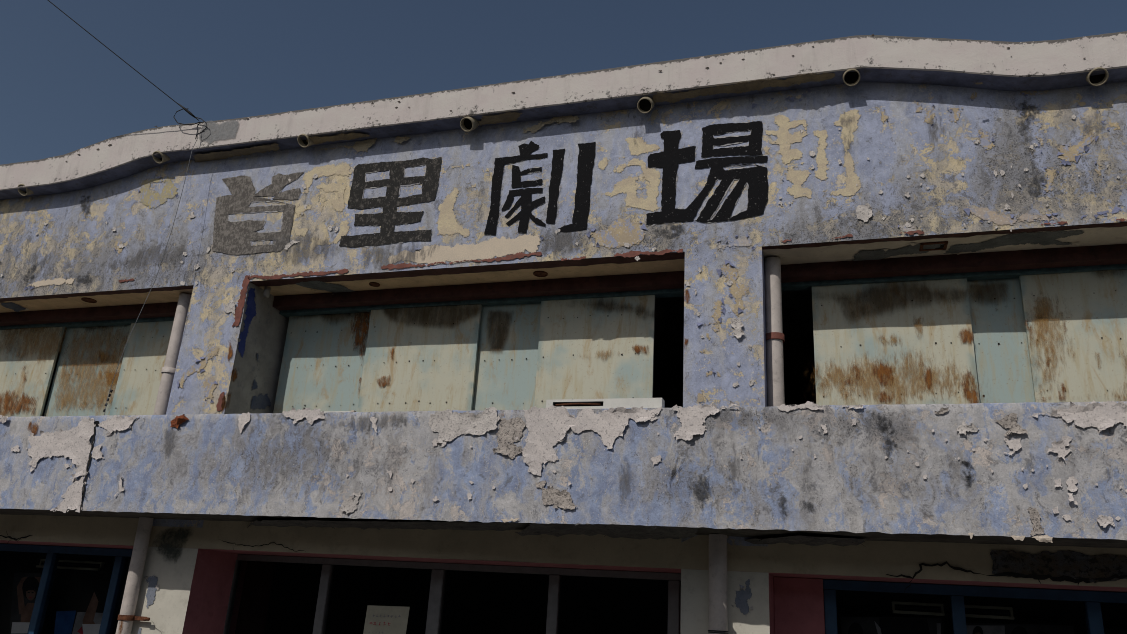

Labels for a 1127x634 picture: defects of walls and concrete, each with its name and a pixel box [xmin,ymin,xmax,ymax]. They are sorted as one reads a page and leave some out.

peeling [652,73,836,103]
peeling [306,112,791,265]
rust [0,390,38,436]
peeling [10,415,138,513]
rust [55,326,128,410]
rust [384,305,510,351]
peeling [428,393,739,510]
rust [815,354,979,404]
rust [960,329,974,343]
peeling [994,400,1127,489]
spalling [990,476,1127,583]
crack [886,561,1127,592]